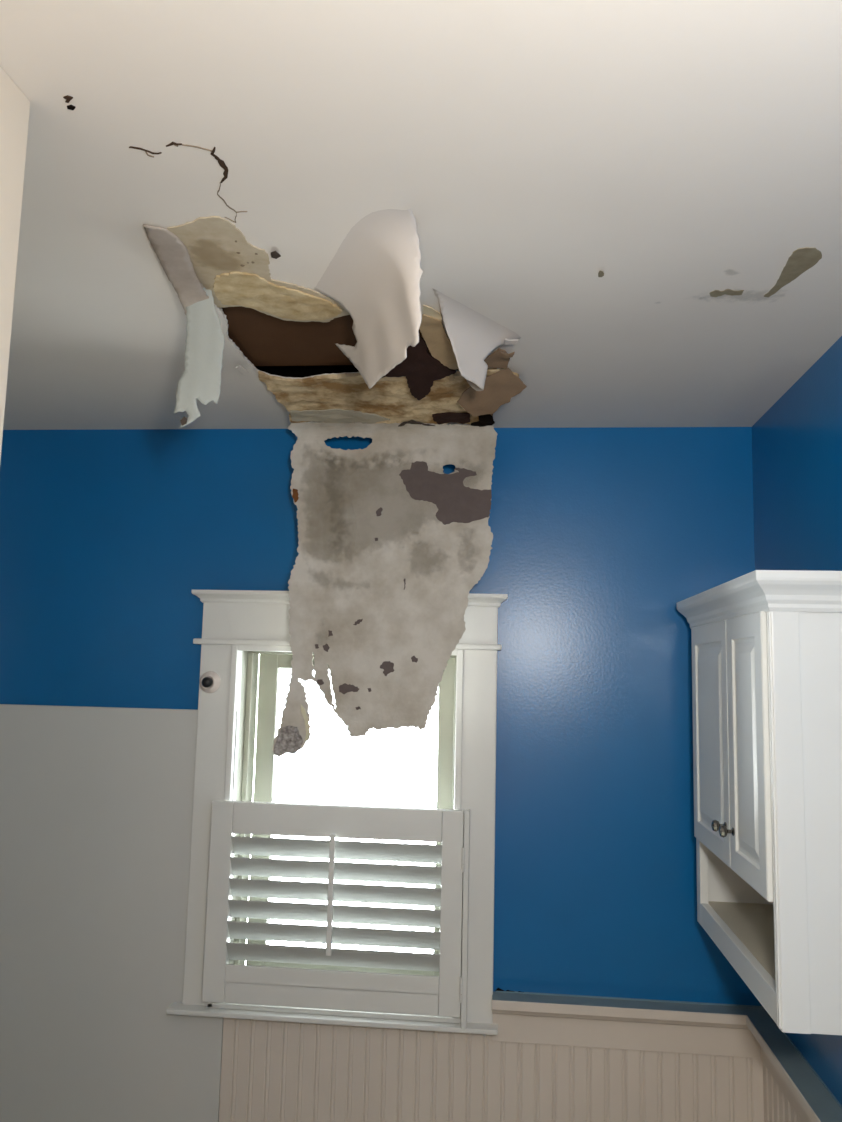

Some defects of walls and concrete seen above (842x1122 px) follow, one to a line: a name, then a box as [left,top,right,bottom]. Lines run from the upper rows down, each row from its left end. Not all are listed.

crack [129,142,247,223]
peeling [167,209,521,391]
peeling [709,289,744,297]
peeling [764,247,822,298]
peeling [399,461,492,525]